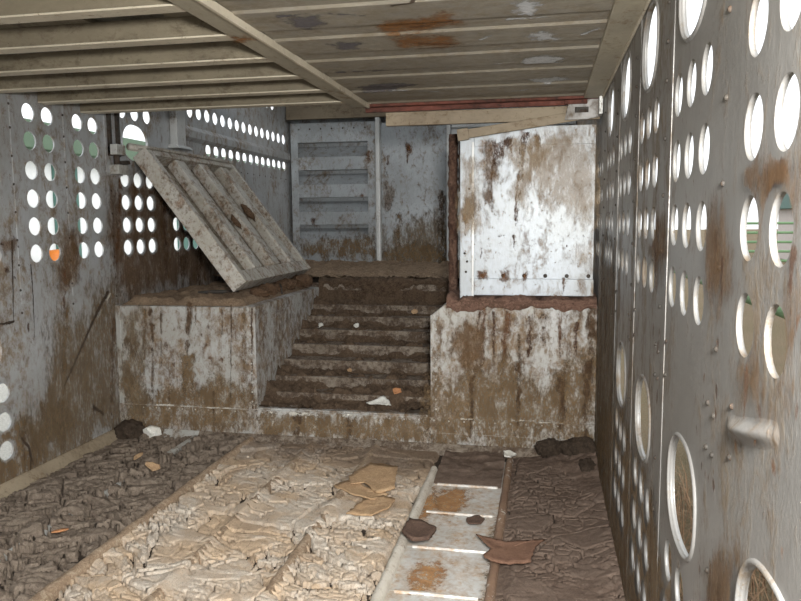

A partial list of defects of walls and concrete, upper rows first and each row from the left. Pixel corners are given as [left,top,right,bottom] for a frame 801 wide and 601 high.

rust [377,11,462,48]
rust [460,132,541,247]
rust [745,156,795,208]
damp [438,191,446,249]
rust [705,200,731,303]
damp [230,305,253,400]
rust [452,308,533,371]
rust [574,308,598,382]
rust [419,487,471,520]
rust [407,561,447,596]
rust [699,546,737,601]